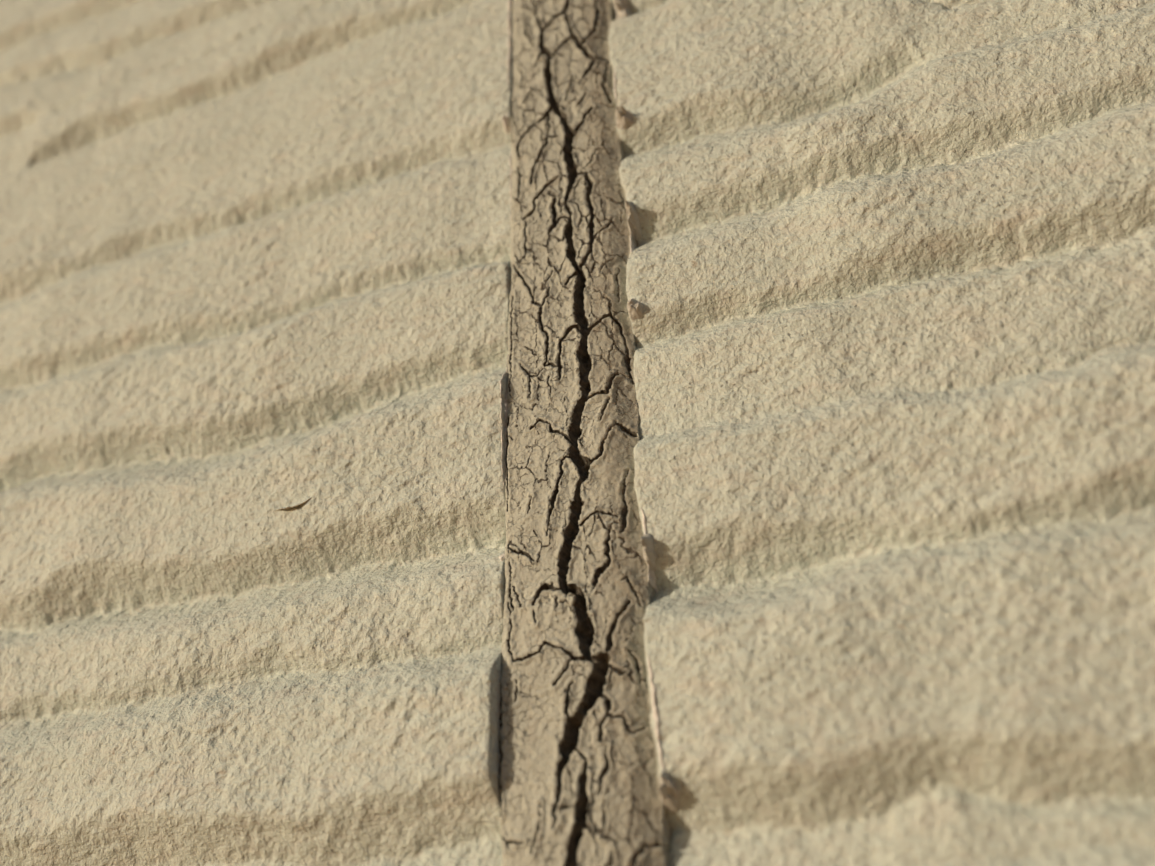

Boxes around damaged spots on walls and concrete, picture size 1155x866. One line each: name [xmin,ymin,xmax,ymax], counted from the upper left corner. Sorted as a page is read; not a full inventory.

crack [498,0,664,866]